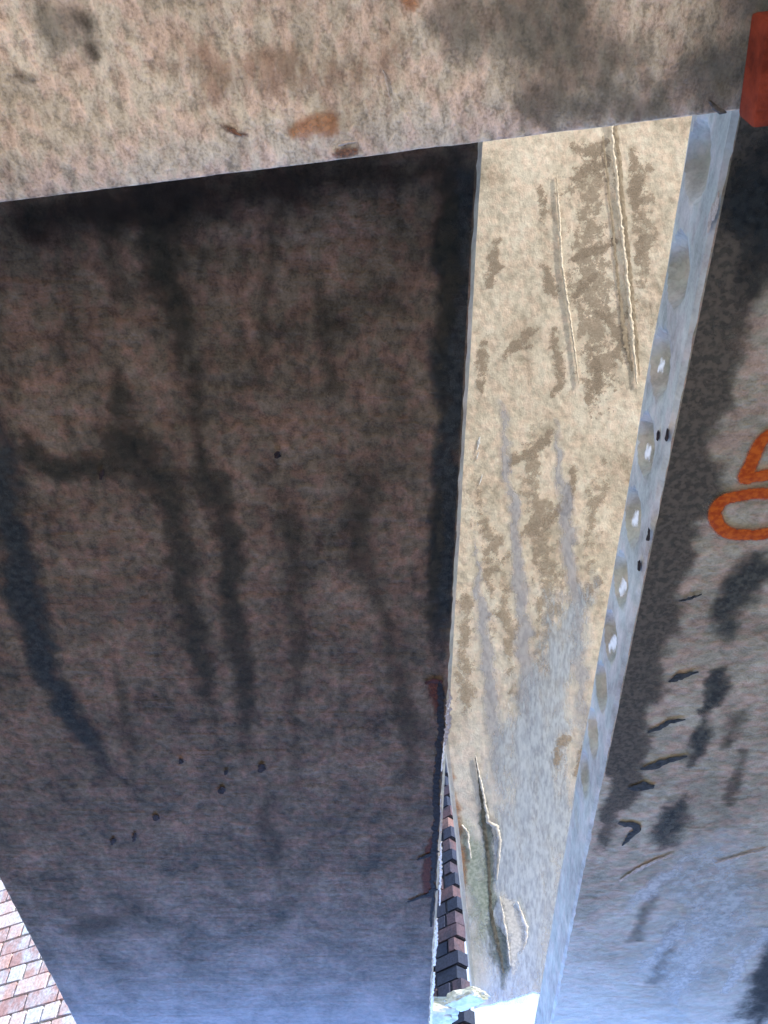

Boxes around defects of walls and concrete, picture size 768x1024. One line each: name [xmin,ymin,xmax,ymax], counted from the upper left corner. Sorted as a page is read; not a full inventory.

leakage [0,382,212,763]
leakage [140,210,190,354]
leakage [194,457,254,723]
rust [291,114,335,138]
leakage [428,159,474,640]
leakage [469,411,593,1003]
leakage [598,117,768,847]
flaking render [499,896,529,974]